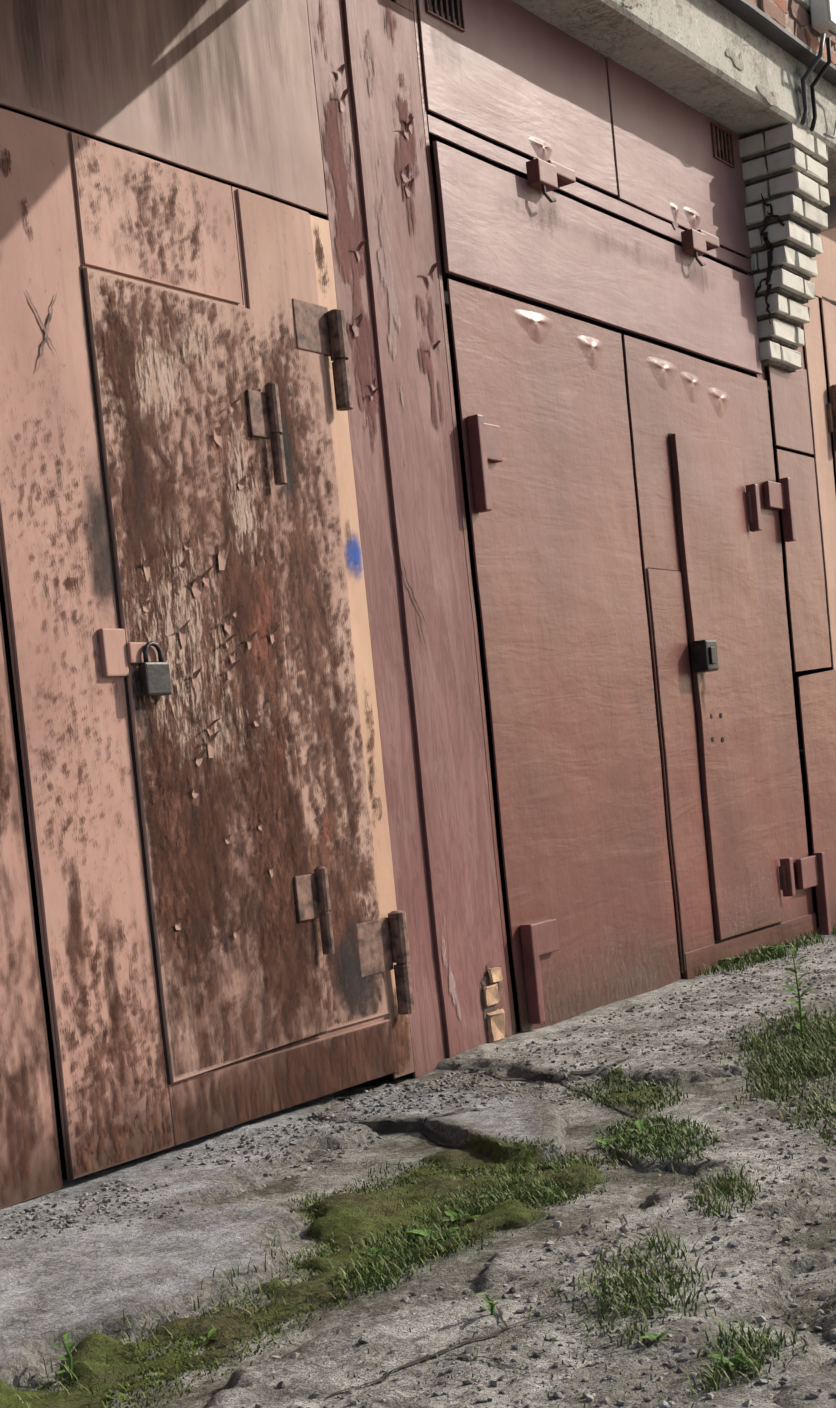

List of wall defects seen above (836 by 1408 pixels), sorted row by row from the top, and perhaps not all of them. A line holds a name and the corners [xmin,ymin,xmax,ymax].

corrosion [0,148,11,177]
corrosion [22,198,33,240]
corrosion [76,139,217,284]
corrosion [0,314,411,1205]
crack [322,1056,693,1167]